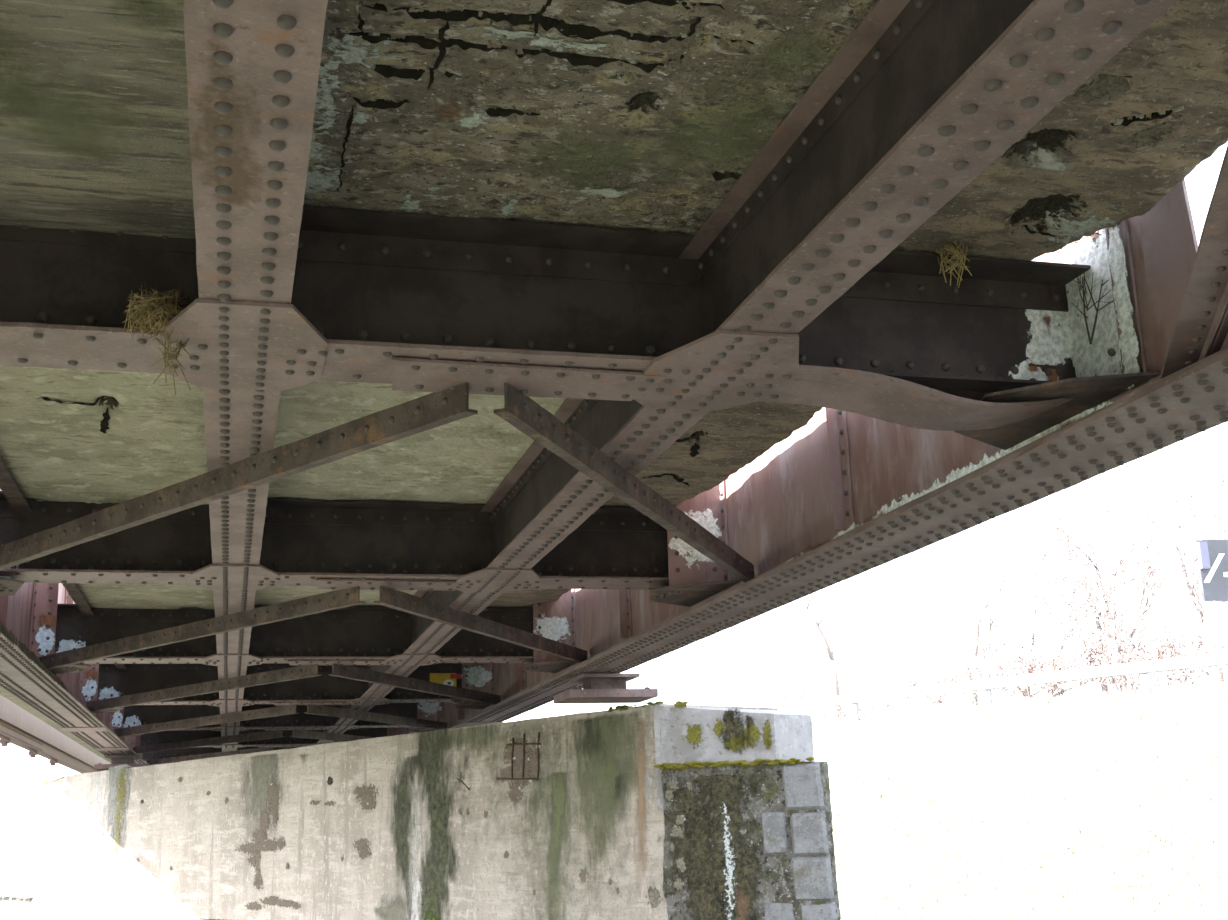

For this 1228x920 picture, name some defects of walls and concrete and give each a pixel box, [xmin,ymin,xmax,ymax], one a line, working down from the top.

crack [333,0,758,192]
spalling [1002,128,1077,166]
spalling [1006,194,1087,235]
water stain [243,754,278,833]
water stain [375,725,548,920]
water stain [534,715,653,920]
water stain [718,804,737,920]